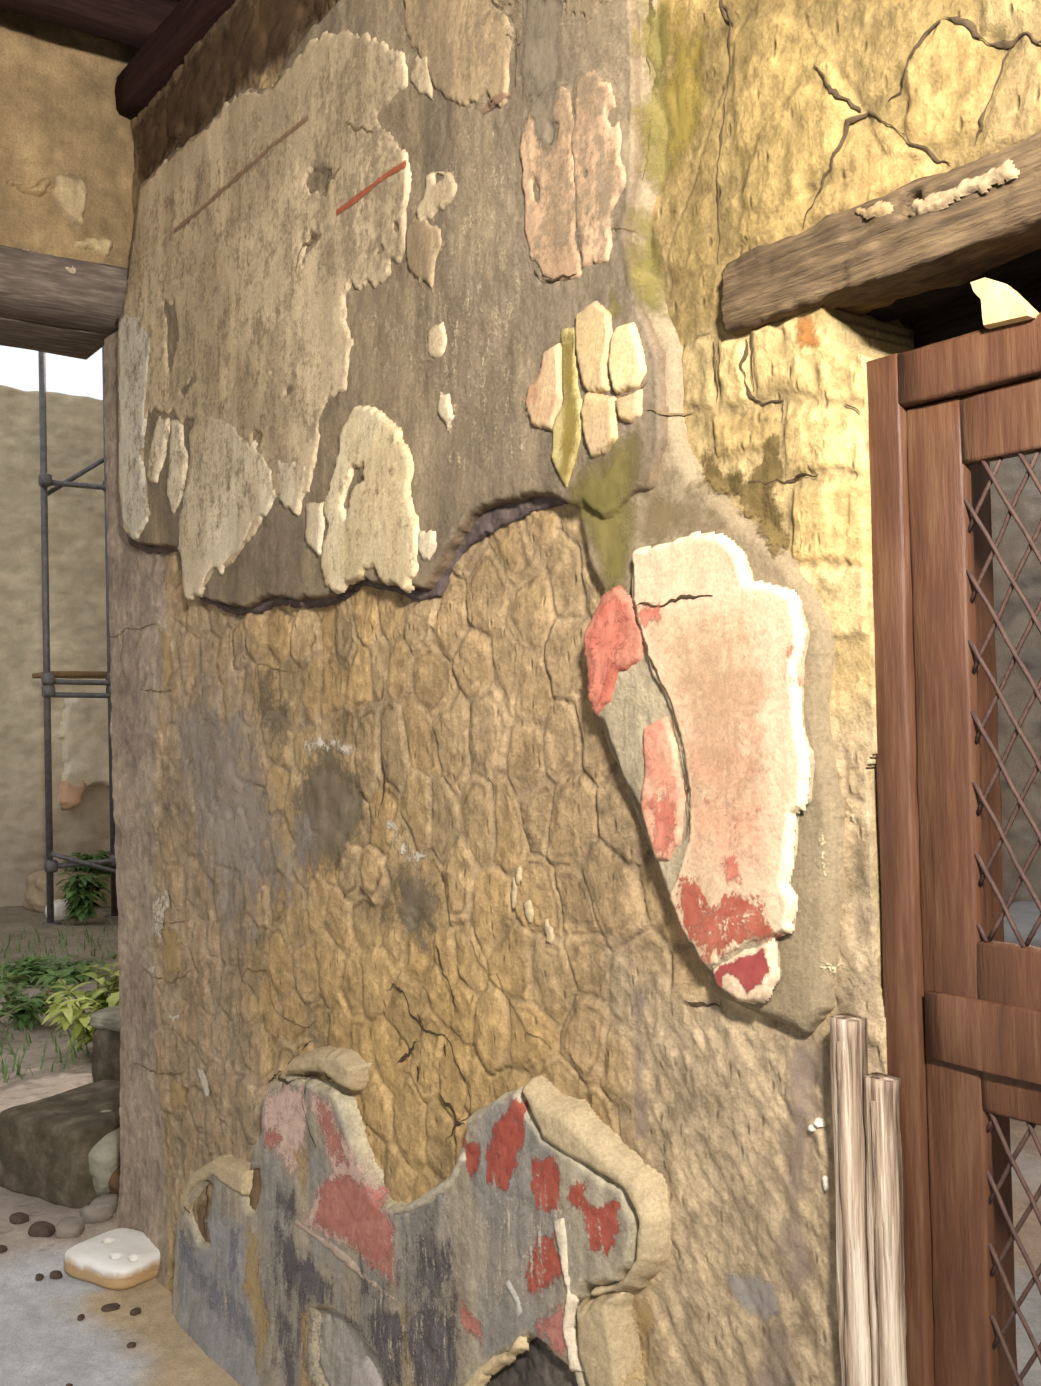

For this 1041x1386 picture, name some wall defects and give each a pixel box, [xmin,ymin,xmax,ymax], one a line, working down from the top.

flaking render [6,174,113,257]
crack [716,0,734,261]
crack [803,0,1041,228]
flaking render [117,0,669,616]
water stain [561,335,578,480]
crack [617,329,784,418]
crack [634,594,713,832]
crack [389,940,552,1148]
flaking render [192,1181,213,1242]
flaking render [249,1168,261,1211]
flaking render [264,1207,457,1386]
flaking render [464,1218,585,1386]